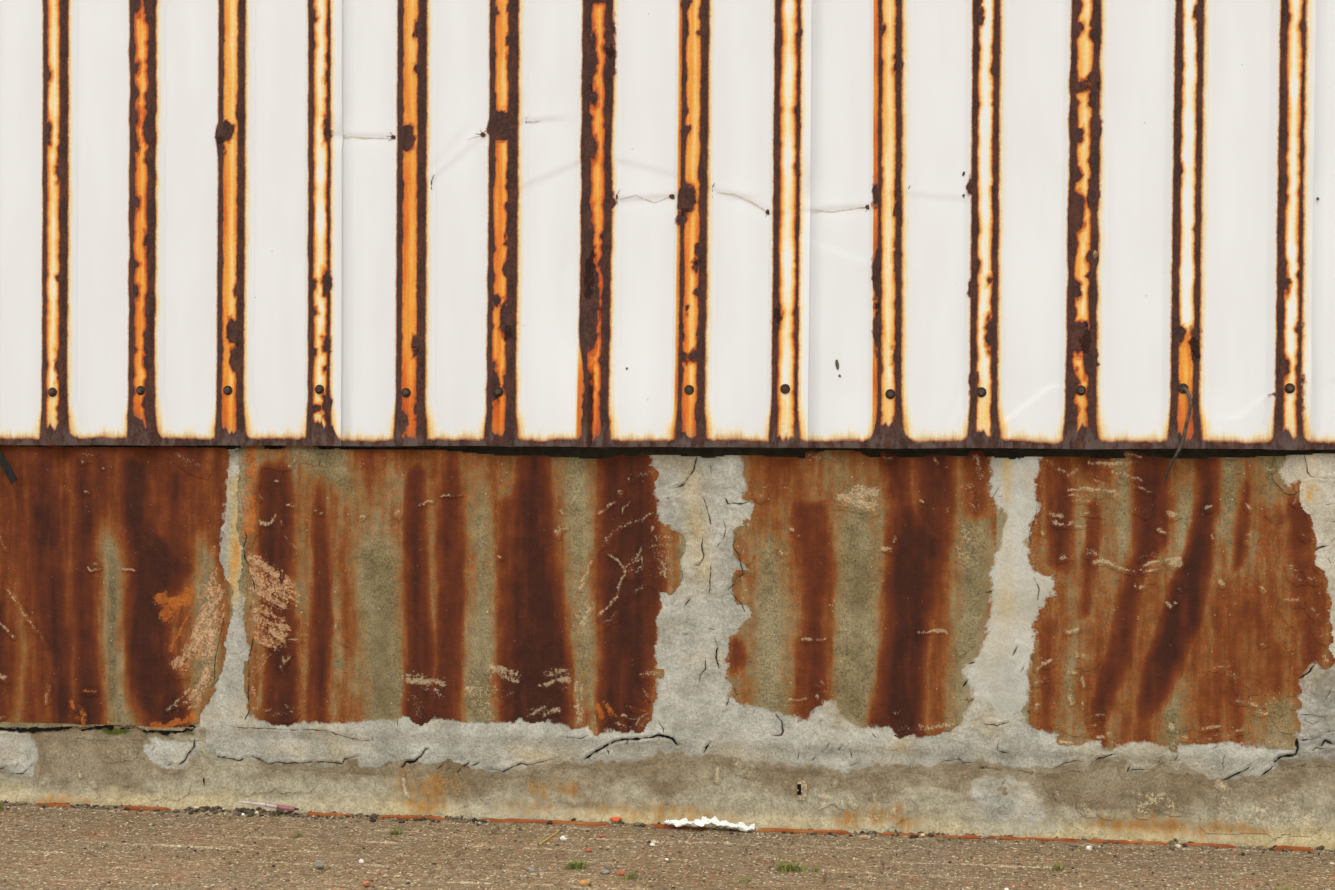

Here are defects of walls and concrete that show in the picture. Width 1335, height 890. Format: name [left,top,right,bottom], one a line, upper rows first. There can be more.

rust [341,0,1335,450]
crack [0,532,547,786]
rust [0,0,655,726]
crack [569,724,710,759]
spalling [797,778,807,801]
rust [734,450,996,725]
rust [1031,454,1328,743]
flaking render [1273,455,1301,494]